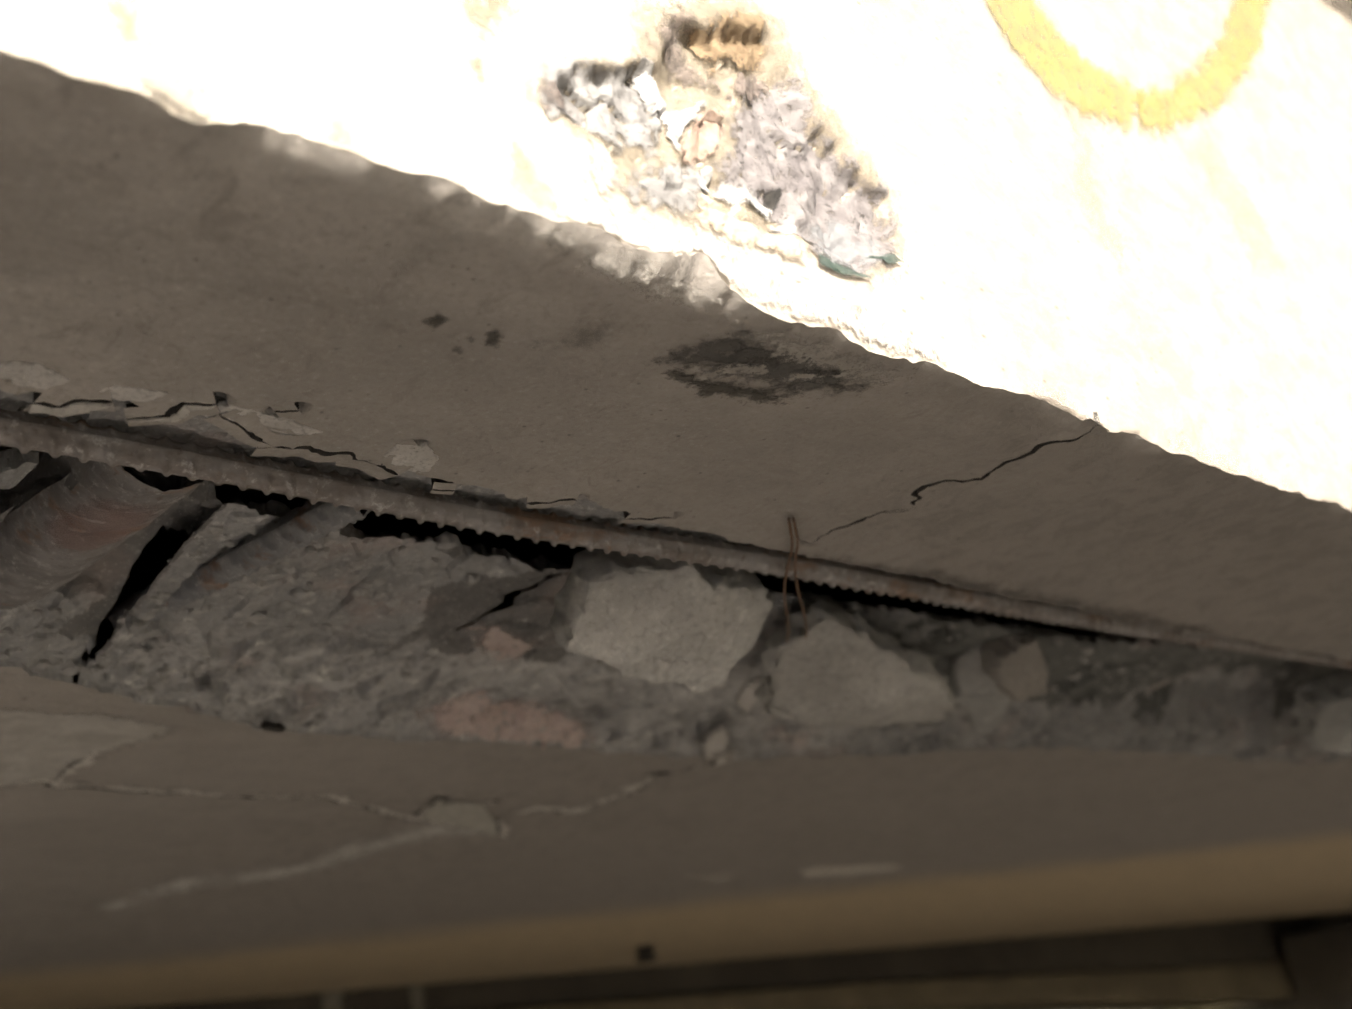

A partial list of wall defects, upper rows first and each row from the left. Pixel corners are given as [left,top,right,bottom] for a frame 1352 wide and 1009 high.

peeling [632,58,707,150]
crack [799,412,1109,544]
spalling [0,390,1352,789]
crack [403,750,737,840]